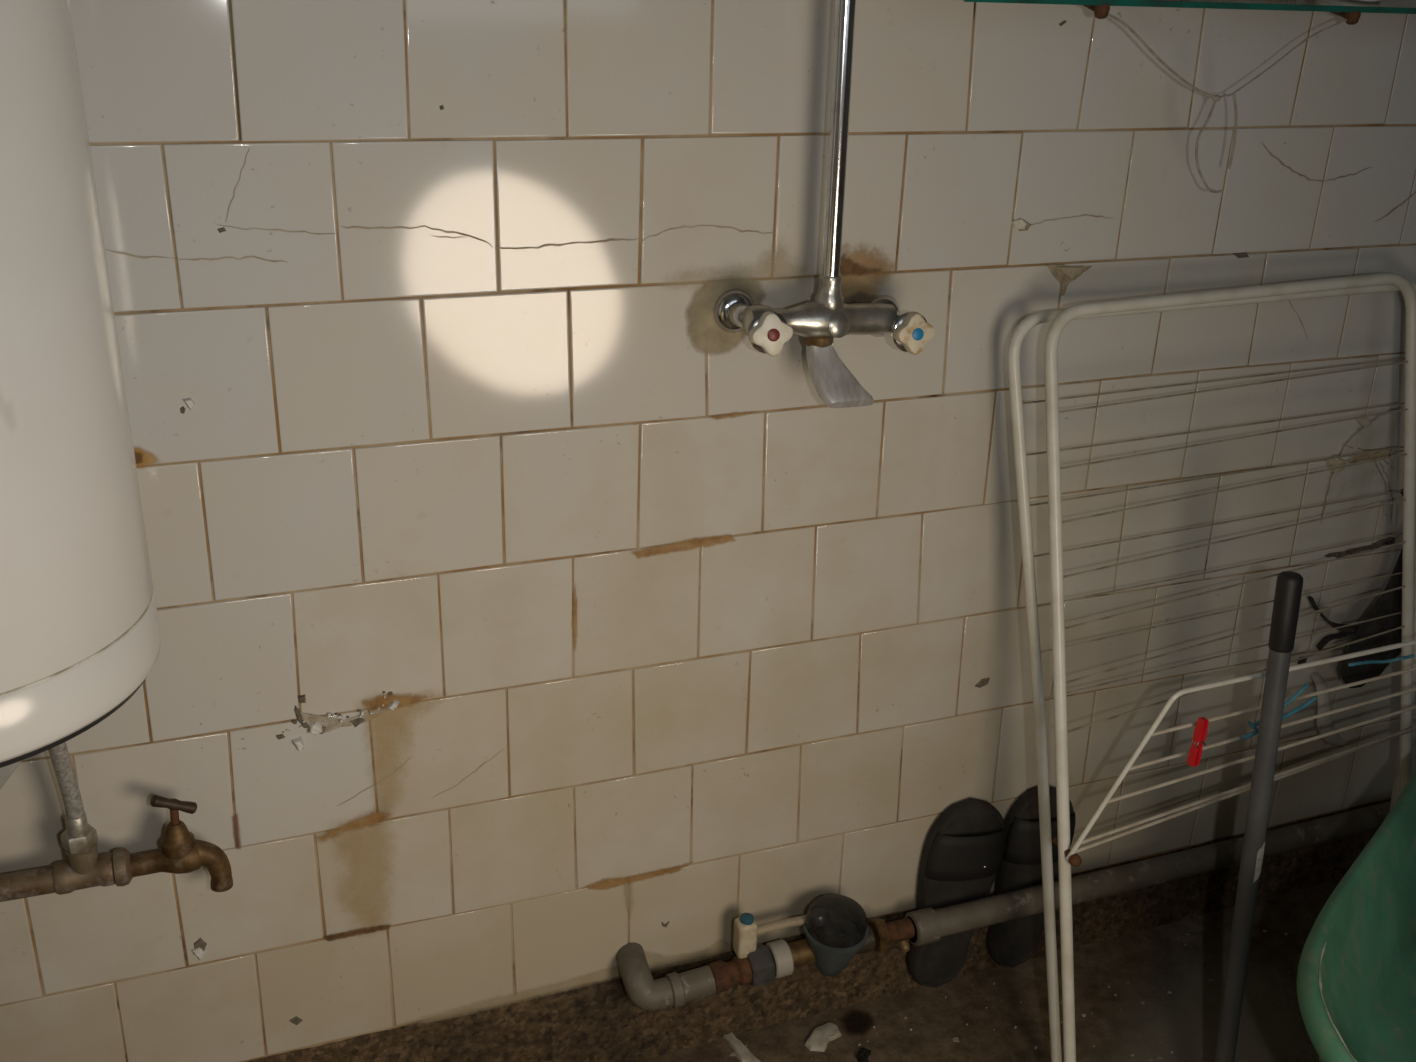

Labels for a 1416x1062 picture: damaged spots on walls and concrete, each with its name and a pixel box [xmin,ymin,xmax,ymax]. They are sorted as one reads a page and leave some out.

crack [107,149,771,262]
water stain [687,254,792,353]
corrosion [134,448,157,467]
corrosion [634,535,734,558]
spalling [276,691,399,751]
corrosion [586,864,688,908]